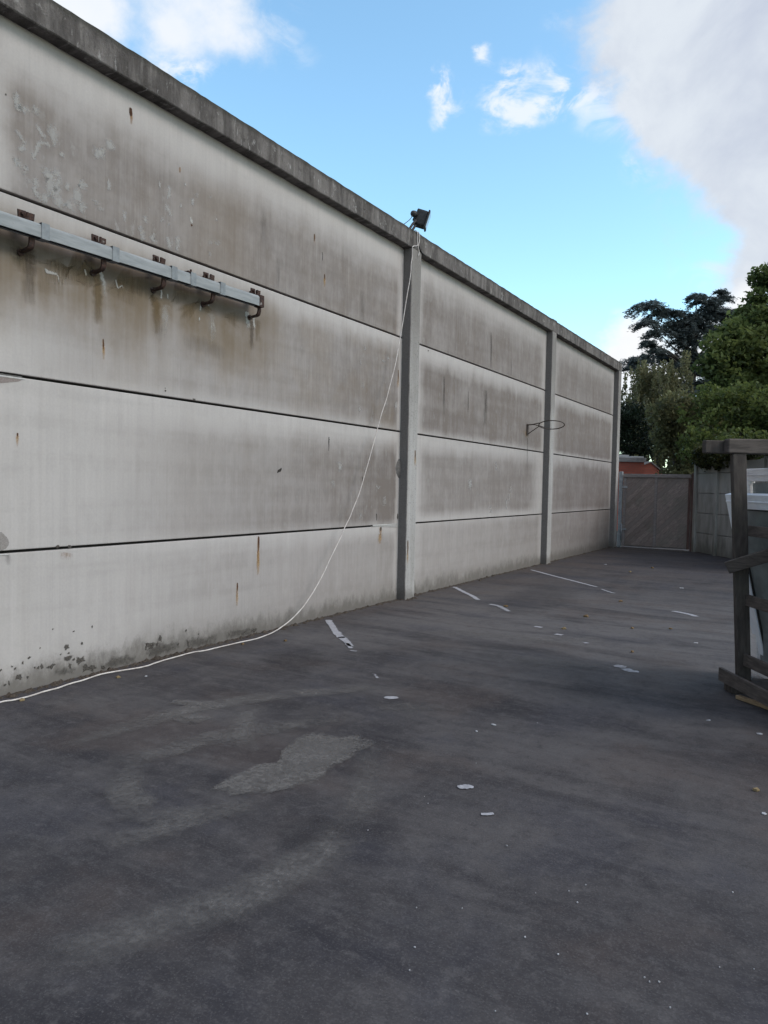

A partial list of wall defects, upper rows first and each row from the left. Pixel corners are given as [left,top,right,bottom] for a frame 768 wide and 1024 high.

leakage [84,265,122,306]
leakage [0,631,129,686]
leakage [145,629,211,656]